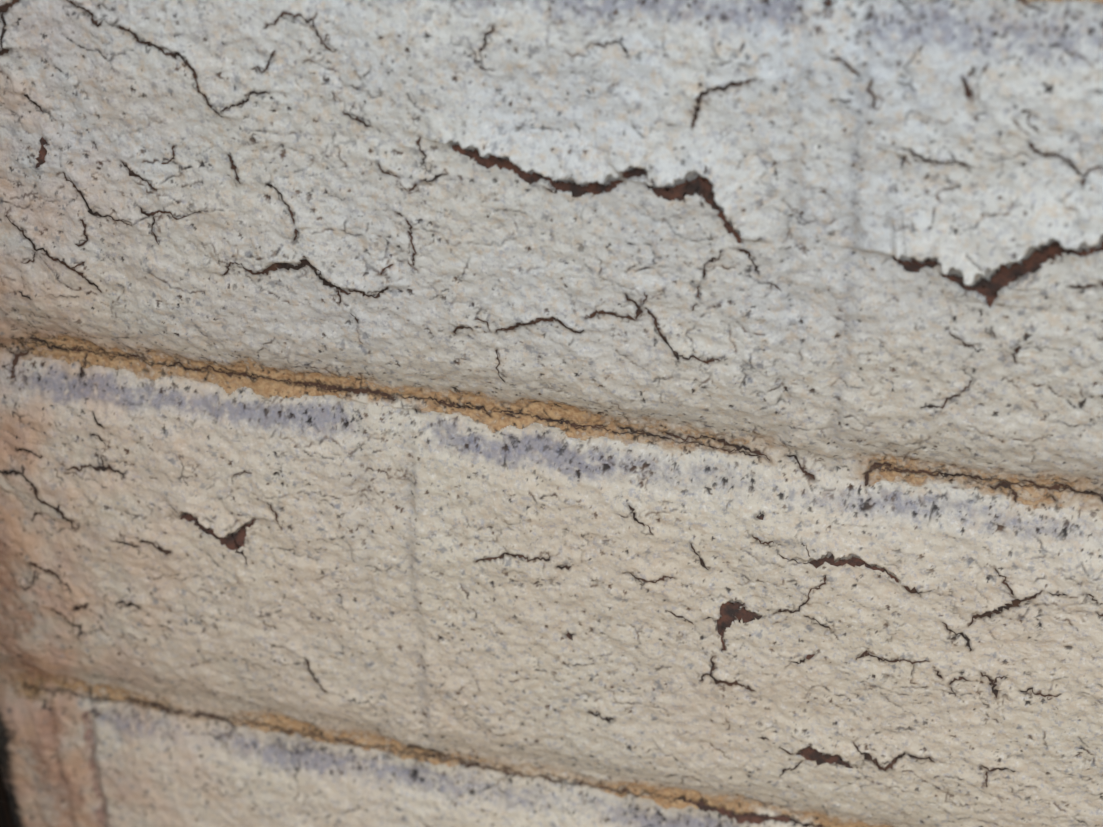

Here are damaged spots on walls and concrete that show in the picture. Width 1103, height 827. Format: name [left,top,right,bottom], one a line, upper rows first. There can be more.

crack [0,0,19,55]
crack [67,0,334,116]
crack [6,146,199,292]
crack [222,137,447,323]
crack [453,293,720,383]
crack [0,335,815,479]
crack [0,449,79,530]
crack [21,562,88,639]
peeling [666,602,762,651]
crack [778,575,830,628]
crack [856,569,1103,698]
crack [853,742,934,771]